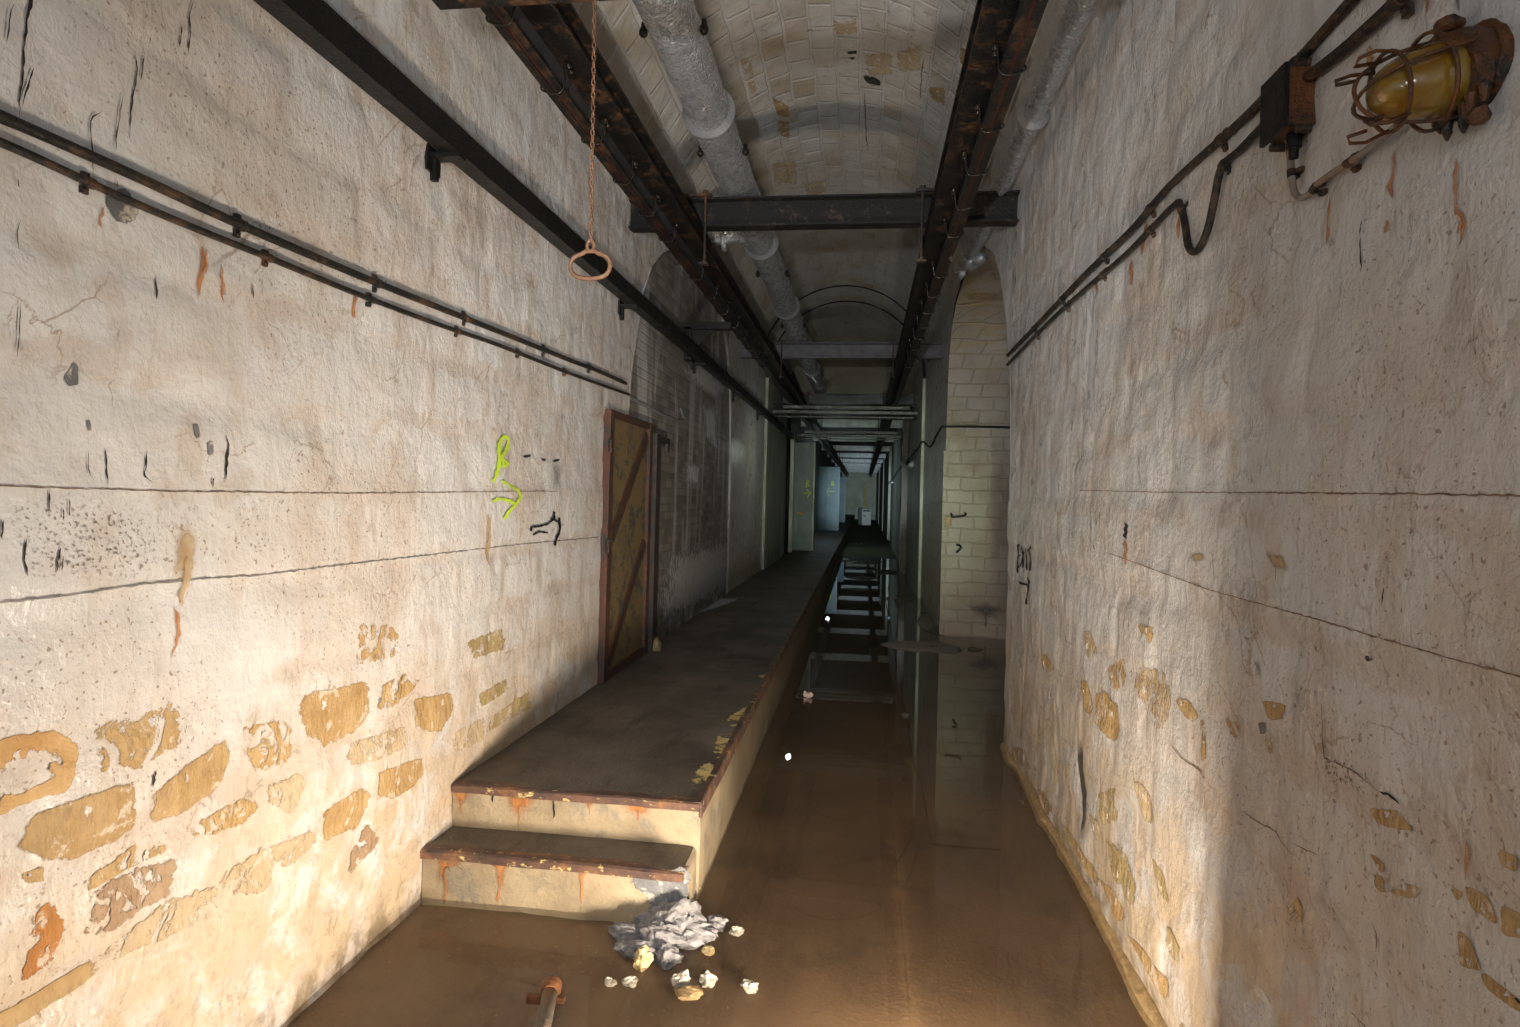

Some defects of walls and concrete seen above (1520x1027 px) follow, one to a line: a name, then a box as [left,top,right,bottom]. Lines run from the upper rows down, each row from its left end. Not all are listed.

rust [1453,162,1465,242]
rust [172,610,181,655]
flaking render [1138,625,1154,642]
flaking render [1081,659,1206,760]
flaking render [1258,701,1285,753]
flaking render [0,625,531,1027]
flaking render [1134,778,1153,824]
flaking render [1033,787,1169,1000]
flaking render [1370,854,1421,898]
flaking render [1447,883,1520,937]
flaking render [1166,926,1183,963]
flaking render [1458,931,1520,1011]